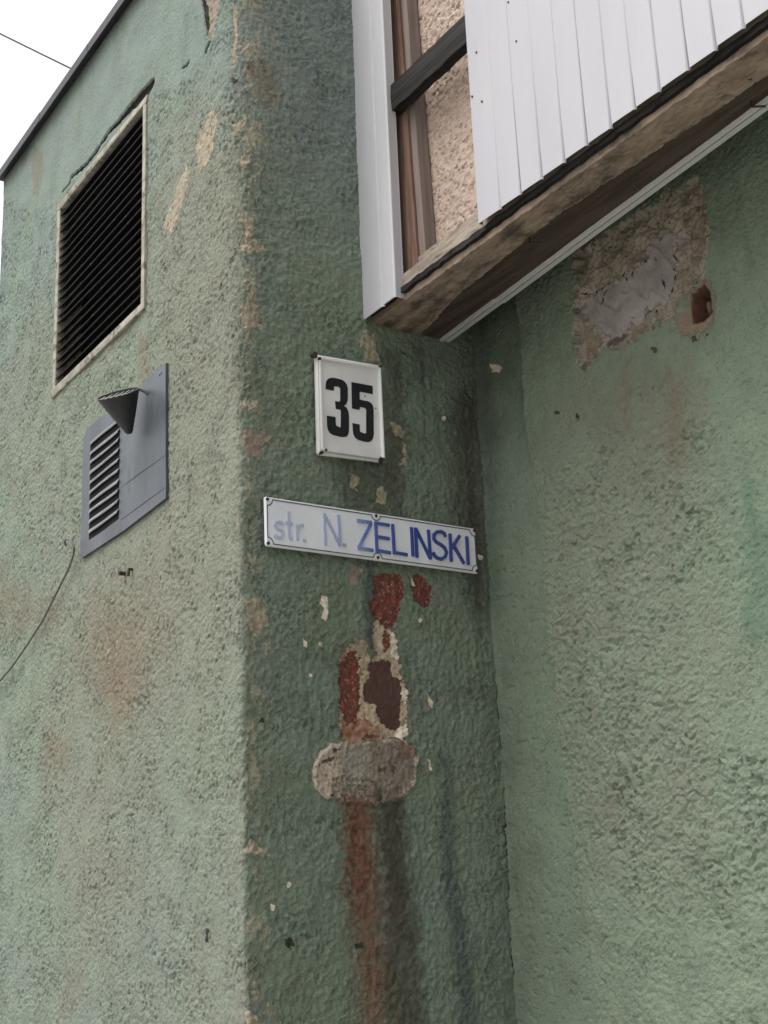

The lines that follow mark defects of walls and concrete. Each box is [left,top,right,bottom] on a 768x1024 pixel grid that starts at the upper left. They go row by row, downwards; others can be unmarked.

crack [63,79,155,192]
peeling [163,108,219,232]
flaking render [569,174,716,371]
peeling [312,563,432,806]